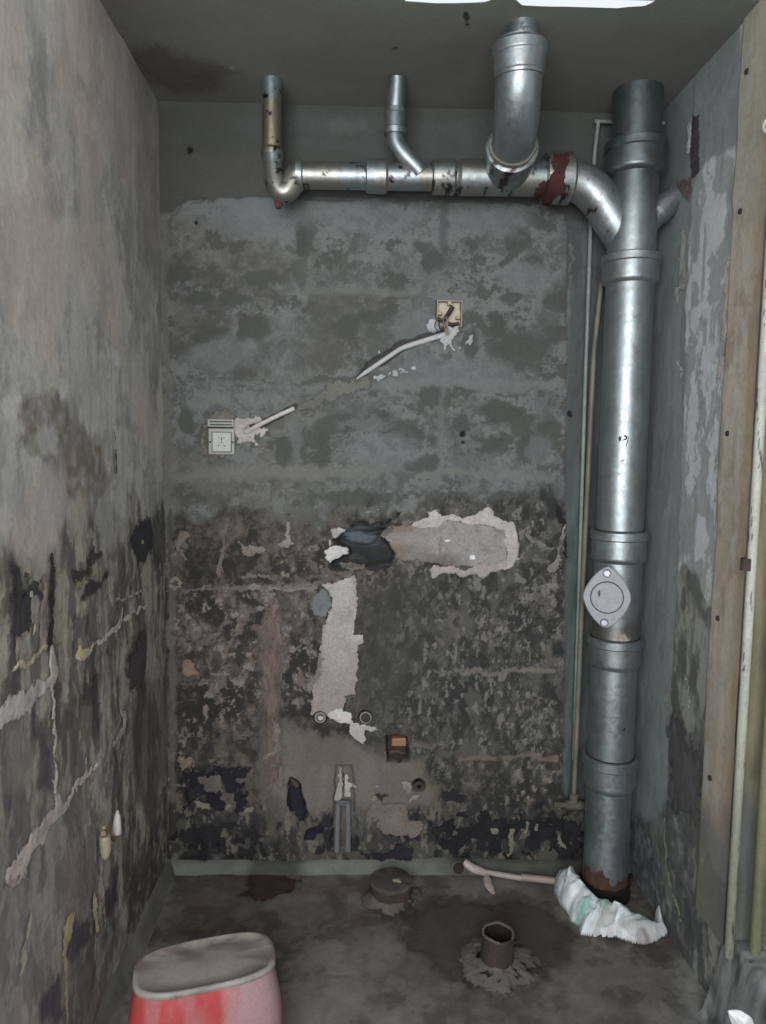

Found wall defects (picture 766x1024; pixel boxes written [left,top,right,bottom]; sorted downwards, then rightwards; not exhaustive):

corrosion [534,153,570,206]
flaking render [175,531,192,561]
flaking render [216,524,265,577]
flaking render [241,503,569,764]
flaking render [334,766,424,841]
water stain [431,788,584,861]
water stain [364,844,413,862]
corrosion [584,863,629,892]